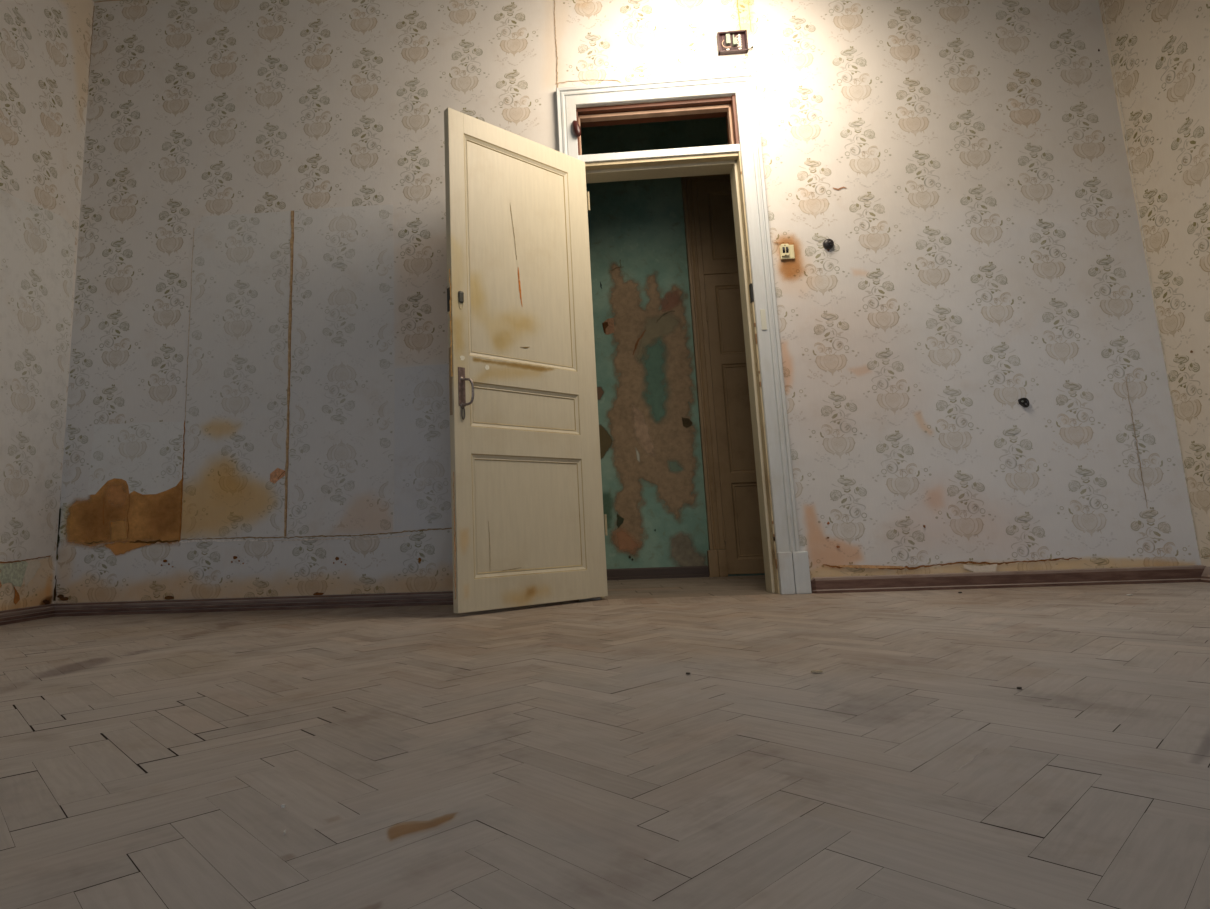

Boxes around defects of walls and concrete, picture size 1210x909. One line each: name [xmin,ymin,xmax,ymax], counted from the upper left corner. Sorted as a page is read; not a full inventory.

peeling [66,472,183,555]
peeling [597,263,697,555]